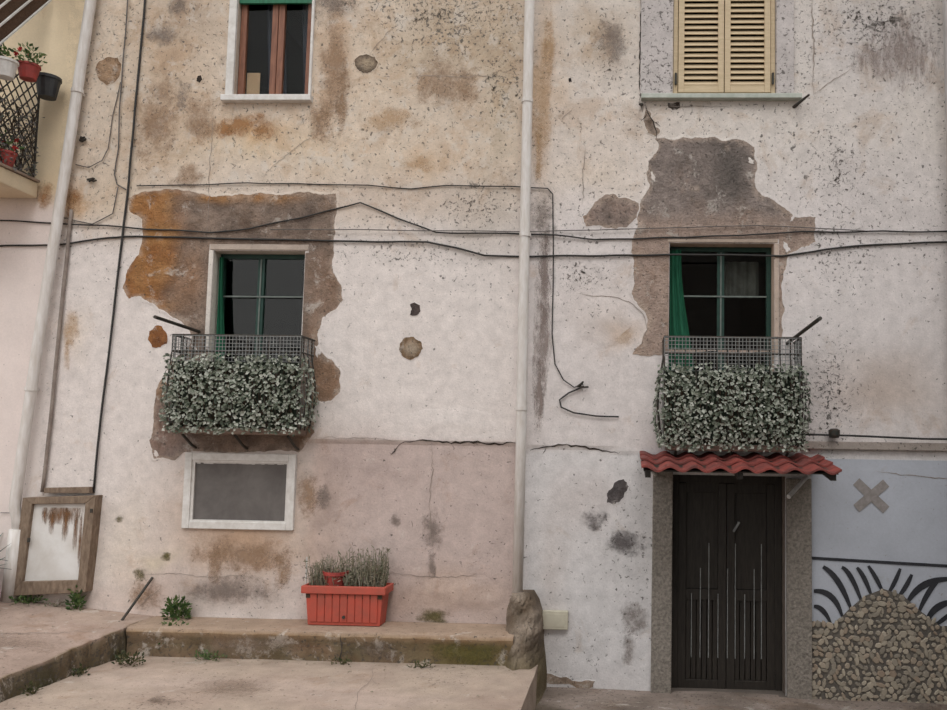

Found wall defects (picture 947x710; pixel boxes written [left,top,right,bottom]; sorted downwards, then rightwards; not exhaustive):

spalling [95,56,122,86]
spalling [353,54,379,74]
spalling [581,106,819,356]
spalling [120,167,345,463]
spalling [409,301,421,317]
spalling [399,336,424,361]
crack [318,436,619,553]
damp [611,532,635,551]
damp [198,546,288,582]